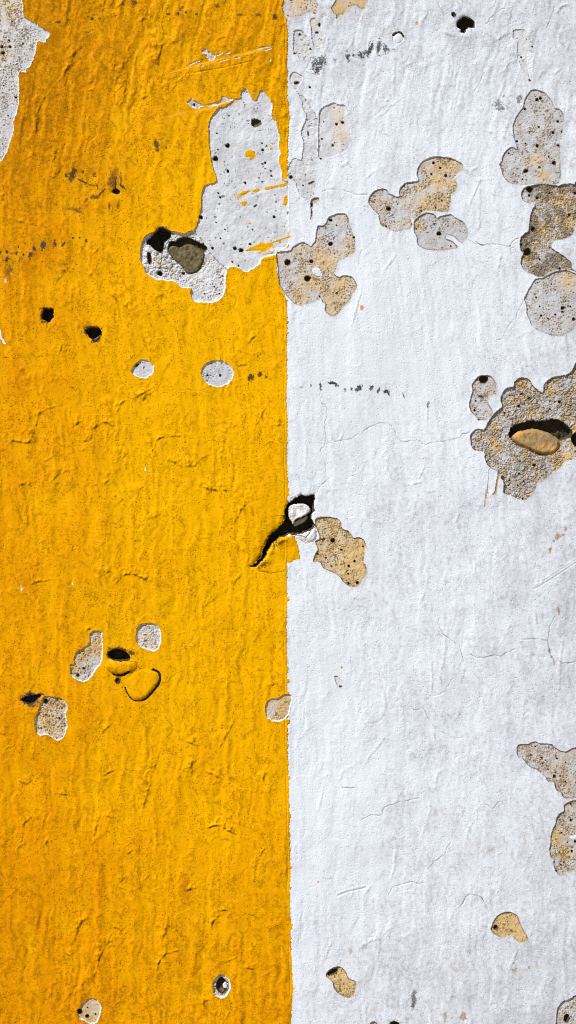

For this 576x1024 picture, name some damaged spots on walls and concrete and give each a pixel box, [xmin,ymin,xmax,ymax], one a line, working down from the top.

peeling [0,0,50,162]
peeling [140,72,358,317]
peeling [369,157,468,251]
peeling [500,29,576,337]
peeling [201,360,234,387]
spalling [470,364,576,500]
peeling [314,517,367,588]
peeling [70,630,103,682]
peeling [136,623,161,652]
peeling [35,696,68,741]
peeling [517,742,576,876]
peeling [326,966,356,998]